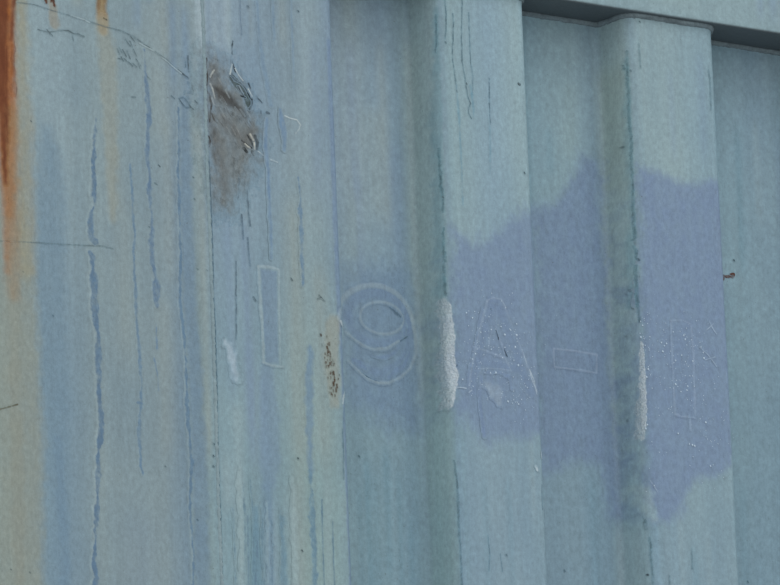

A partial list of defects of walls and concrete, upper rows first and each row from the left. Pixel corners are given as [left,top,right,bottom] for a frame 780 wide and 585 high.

corrosion [93,0,110,16]
corrosion [0,0,63,585]
corrosion [320,311,344,413]